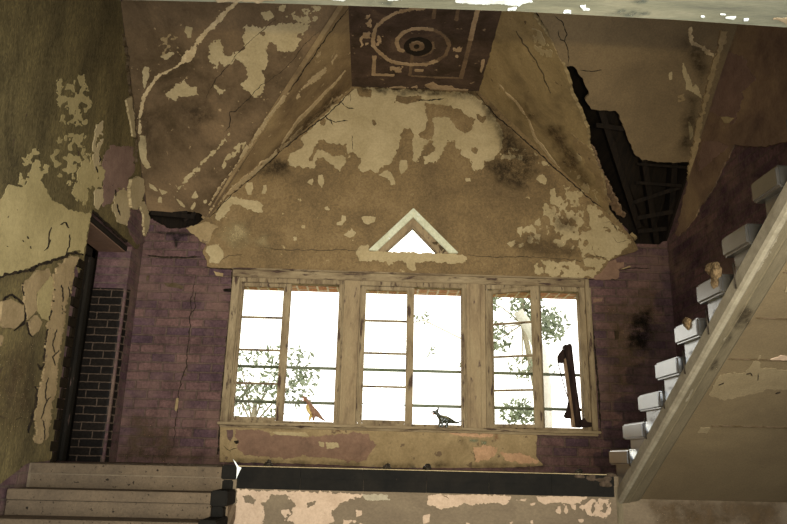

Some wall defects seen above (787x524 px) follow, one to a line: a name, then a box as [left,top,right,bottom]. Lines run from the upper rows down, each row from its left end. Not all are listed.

crack [227,8,349,129]
crack [516,31,551,93]
leakage [493,132,532,186]
peeling [0,0,637,444]
crack [0,222,84,440]
crack [145,254,242,455]
peeling [709,355,787,401]
spalling [226,429,377,464]
peeling [450,433,539,464]
peeling [423,494,611,524]